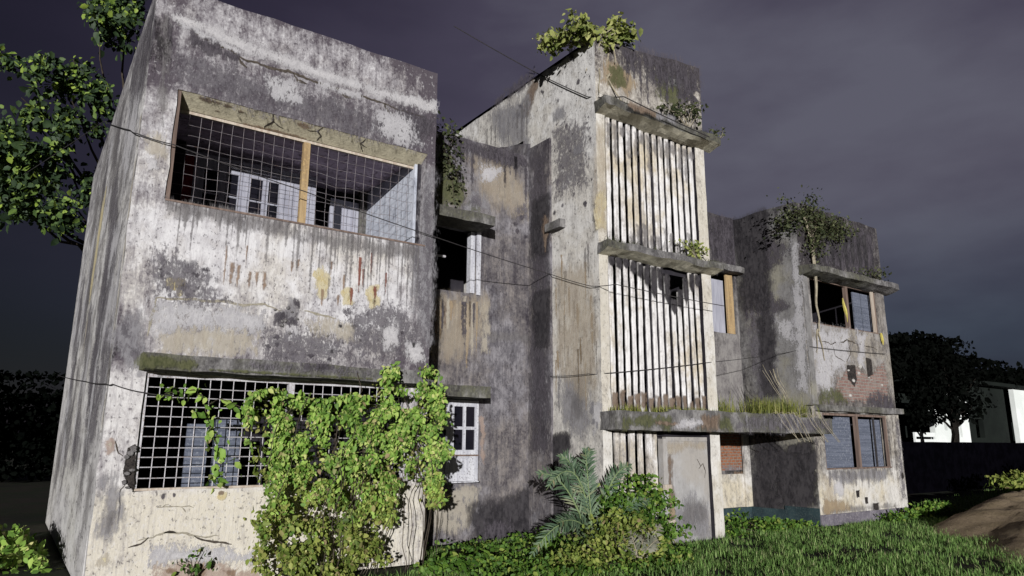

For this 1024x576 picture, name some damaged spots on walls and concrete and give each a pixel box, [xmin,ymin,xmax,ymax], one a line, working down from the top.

crack [178,24,423,117]
rust [224,245,266,289]
rust [337,253,387,304]
leakage [53,0,702,543]
leakage [632,208,875,434]
crack [819,339,875,362]
peeling [812,323,888,405]
flaking render [106,438,137,519]
leakage [867,390,906,500]
crack [128,504,232,548]